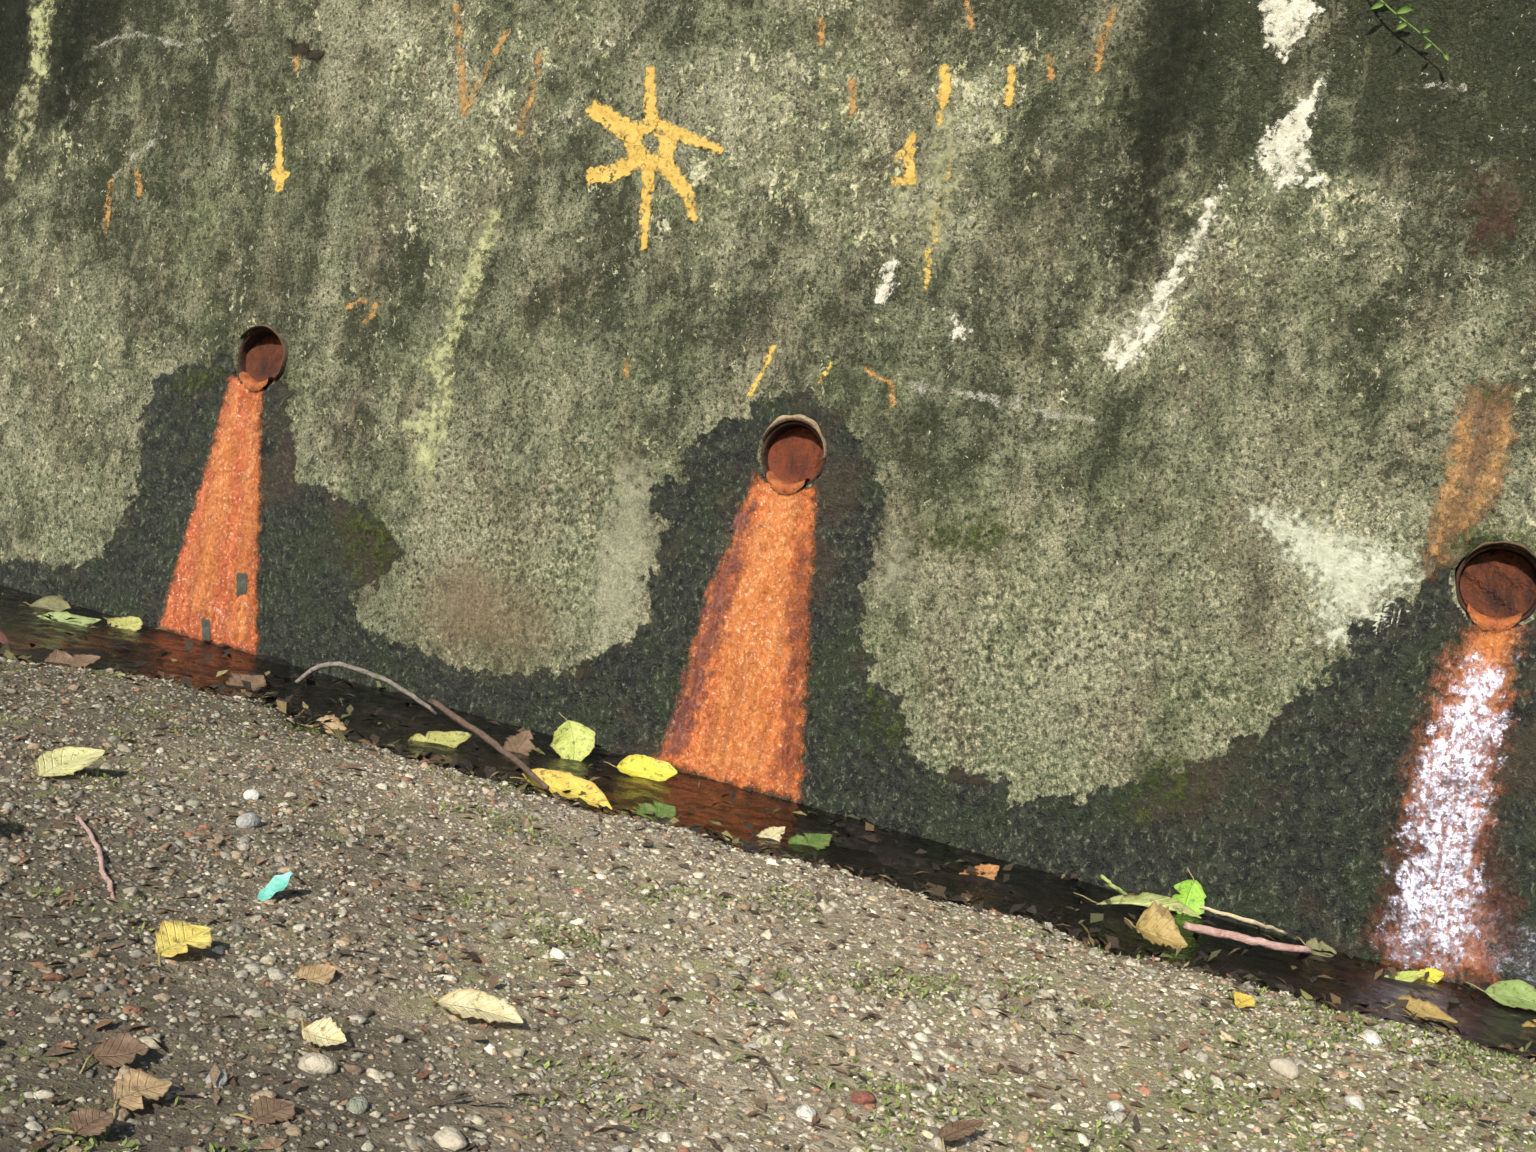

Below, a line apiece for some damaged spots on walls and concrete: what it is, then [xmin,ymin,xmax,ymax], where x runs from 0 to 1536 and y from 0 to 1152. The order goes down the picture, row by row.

rust [159,377,263,654]
rust [654,479,816,800]
water stain [0,349,1536,991]
rust [1363,624,1528,983]
rust [1421,381,1518,578]